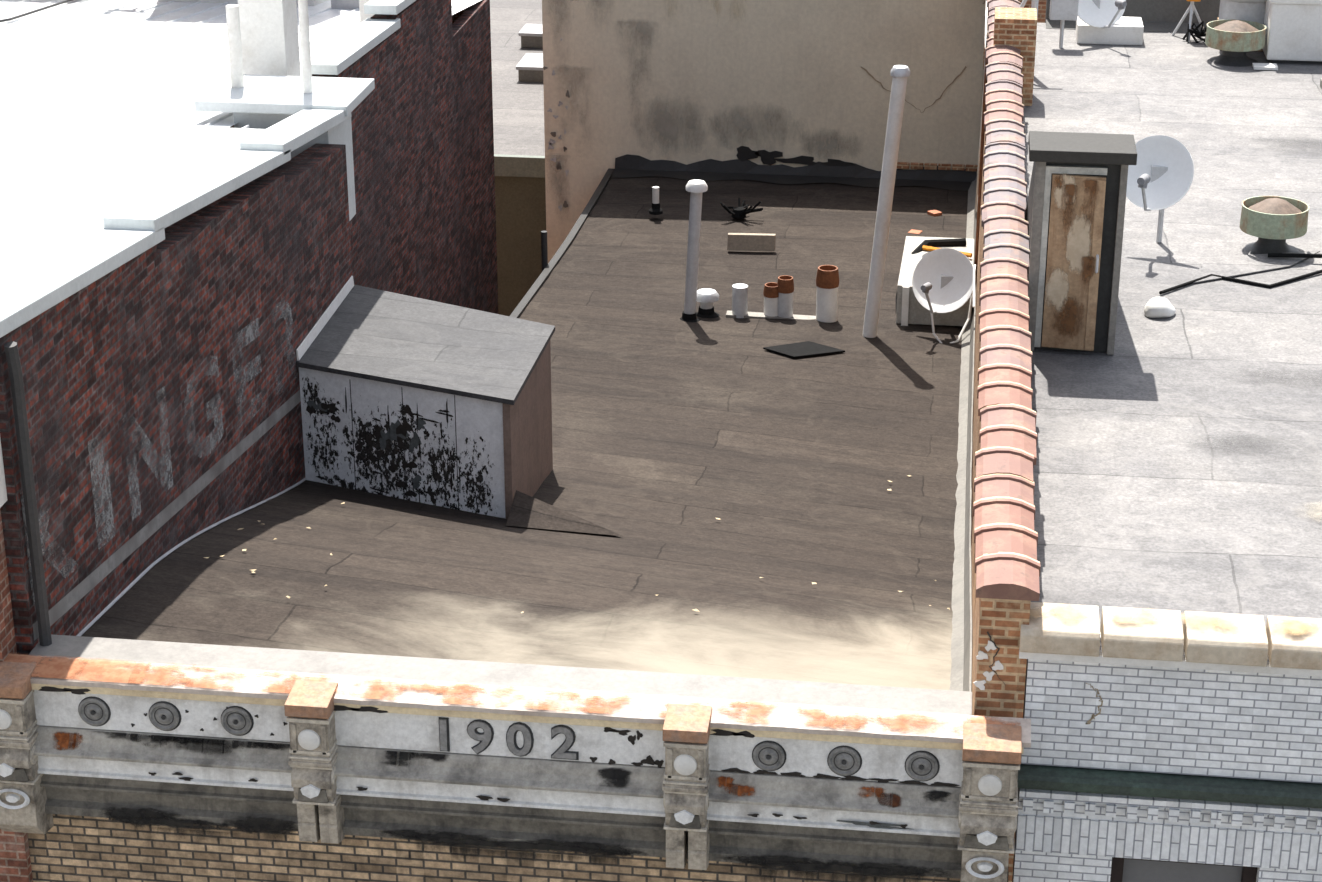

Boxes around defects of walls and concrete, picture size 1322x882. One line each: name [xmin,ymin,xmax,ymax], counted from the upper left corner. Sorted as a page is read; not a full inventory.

peeling [302,378,495,515]
crack [987,632,1006,686]
peeling [4,653,245,695]
peeling [259,671,336,693]
peeling [333,678,643,745]
peeling [661,701,778,738]
peeling [799,707,944,732]
peeling [965,716,1020,726]
peeling [590,755,664,768]
rust [718,776,755,796]
rust [859,787,901,808]
rust [924,790,951,801]